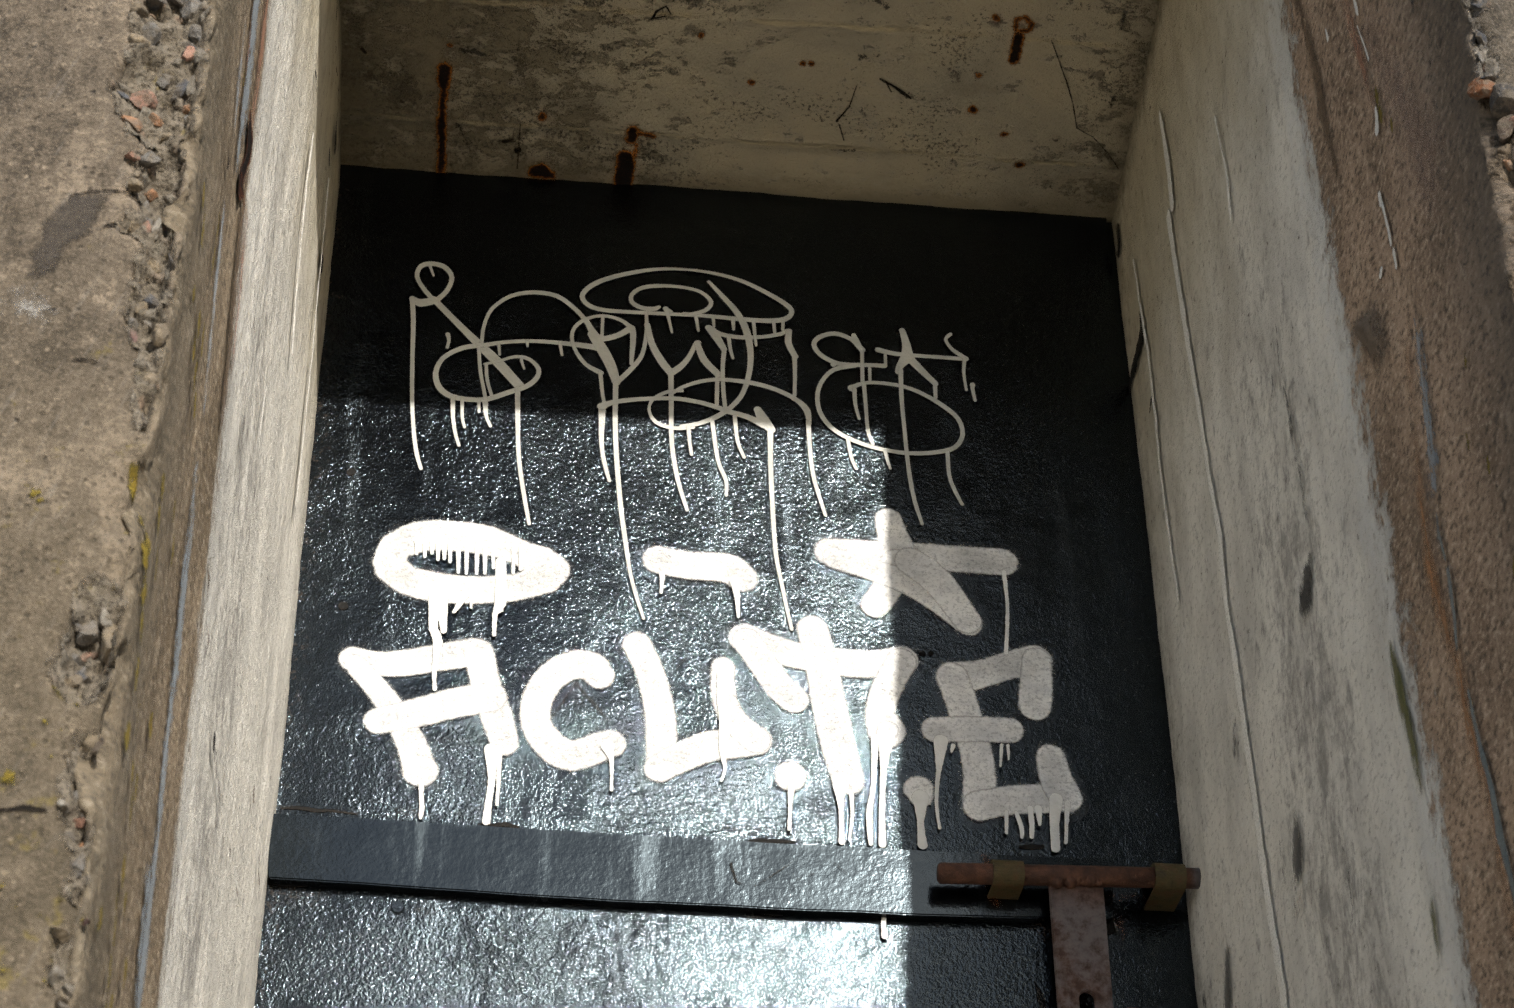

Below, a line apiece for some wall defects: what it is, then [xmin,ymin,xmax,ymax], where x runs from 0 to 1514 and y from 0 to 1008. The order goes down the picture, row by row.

corrosion [991,14,1035,65]
corrosion [435,43,453,173]
corrosion [612,125,656,185]